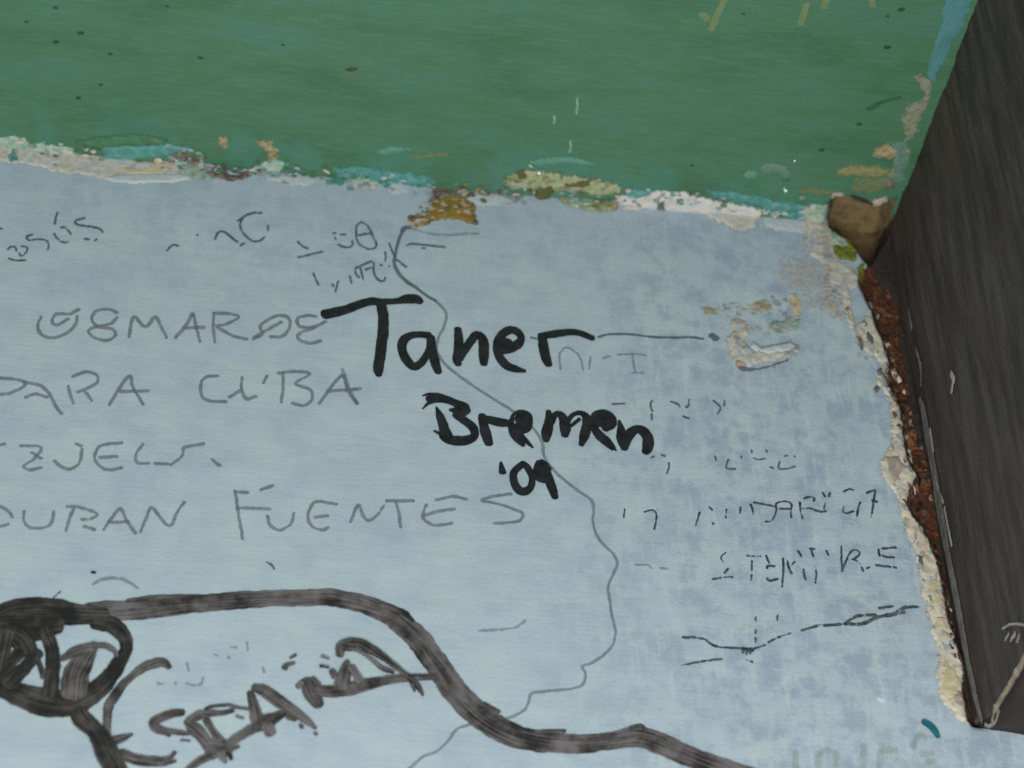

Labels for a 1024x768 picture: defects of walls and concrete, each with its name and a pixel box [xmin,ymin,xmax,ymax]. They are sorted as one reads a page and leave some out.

peeling [0,136,446,200]
rust [407,187,479,227]
peeling [446,73,970,726]
rust [858,231,982,728]